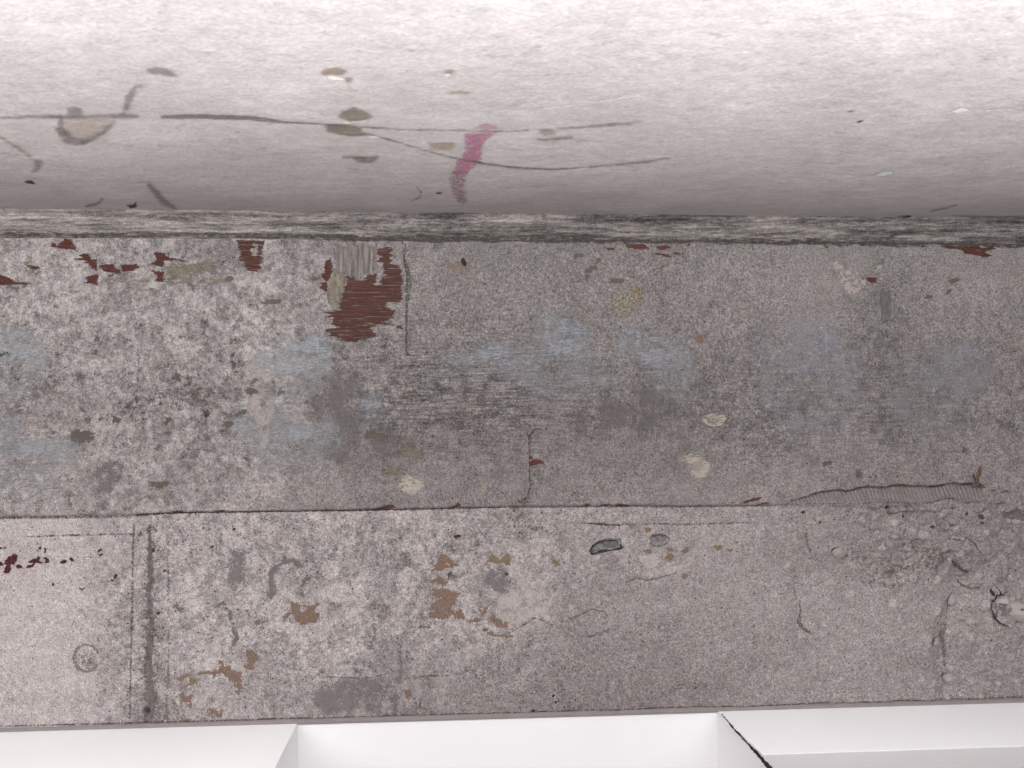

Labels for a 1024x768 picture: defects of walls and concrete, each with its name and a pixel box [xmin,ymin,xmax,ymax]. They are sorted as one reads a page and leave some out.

peeling [0,275,30,285]
peeling [51,239,186,290]
peeling [320,243,412,342]
crack [0,428,1022,768]